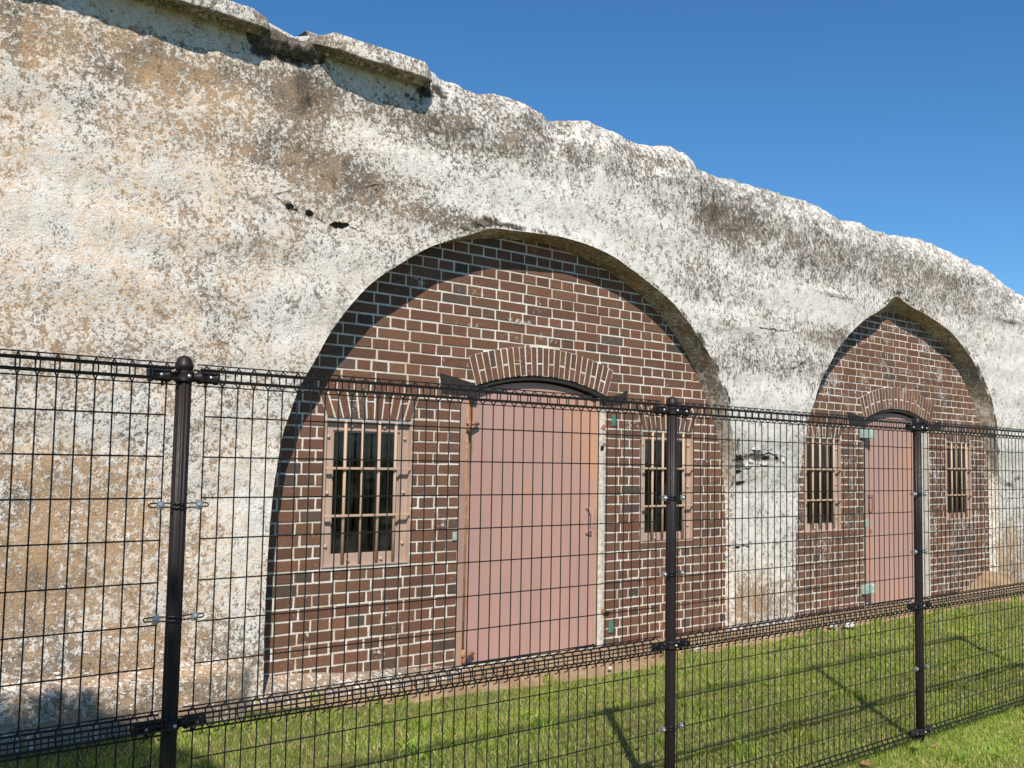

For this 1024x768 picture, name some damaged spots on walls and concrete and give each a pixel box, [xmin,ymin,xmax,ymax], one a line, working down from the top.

spalling [330,221,349,229]
spalling [734,448,785,486]